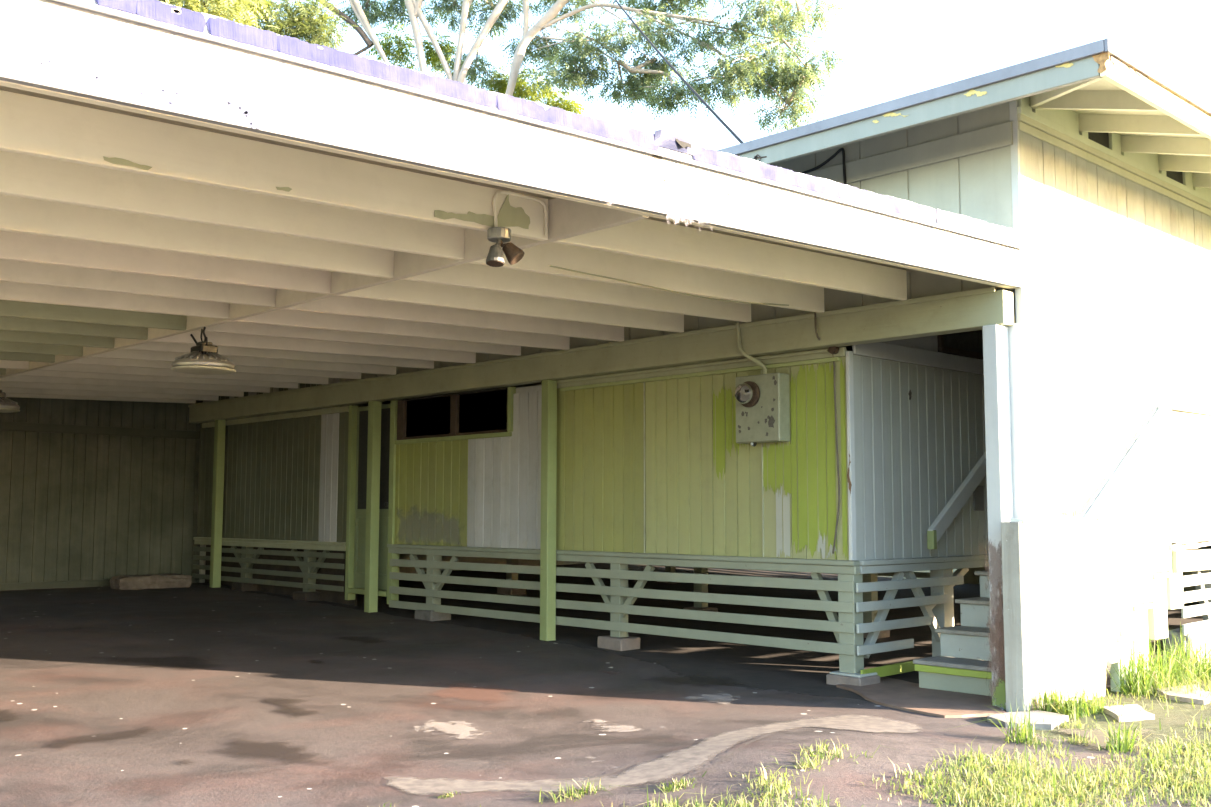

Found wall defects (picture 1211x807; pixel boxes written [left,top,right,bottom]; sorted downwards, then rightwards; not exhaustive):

peeling [1092,52,1110,73]
peeling [95,0,685,192]
peeling [434,194,530,229]
peeling [738,376,777,436]